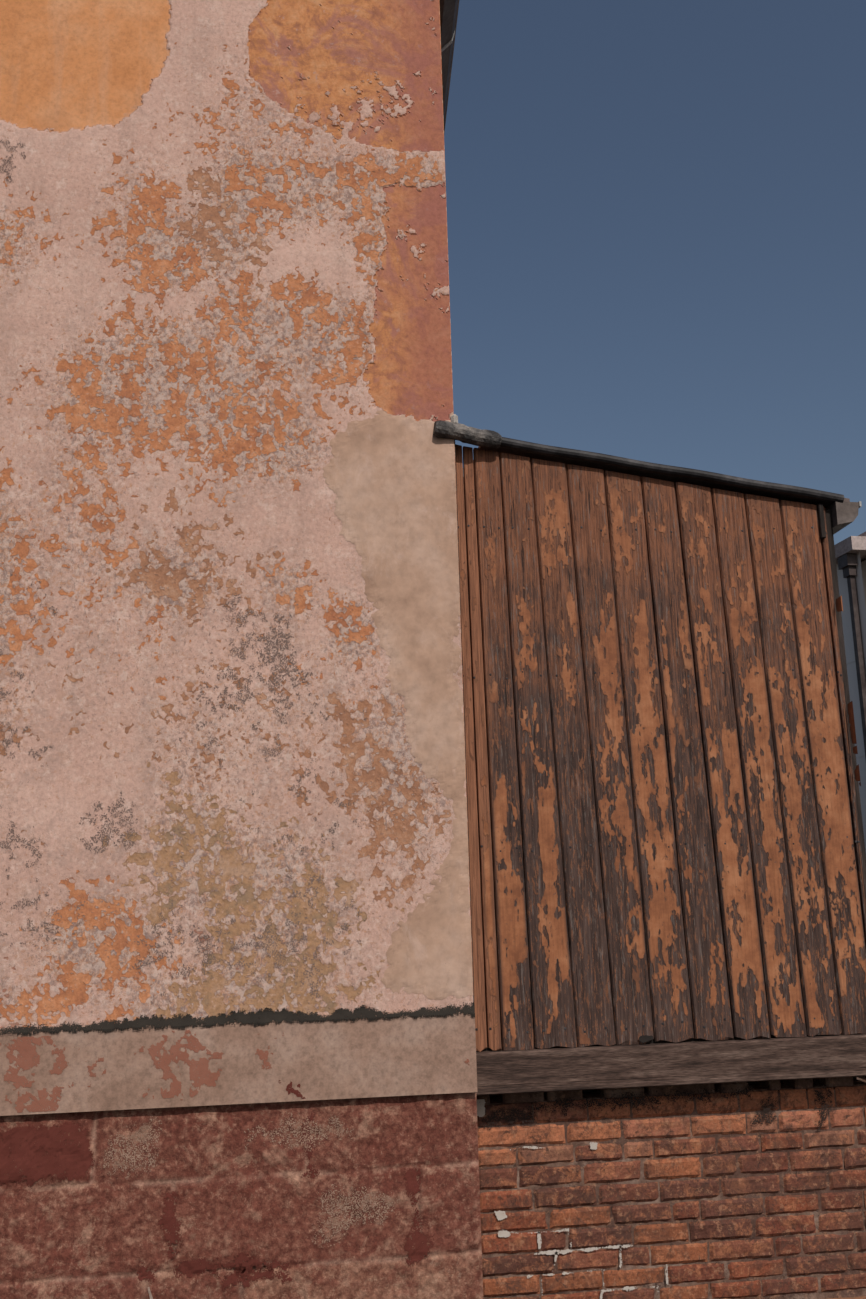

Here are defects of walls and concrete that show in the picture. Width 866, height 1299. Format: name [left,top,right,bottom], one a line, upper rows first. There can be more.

spalling [0,0,453,1113]
peeling [457,451,866,1048]
spalling [92,1116,163,1183]
spalling [243,1033,356,1151]